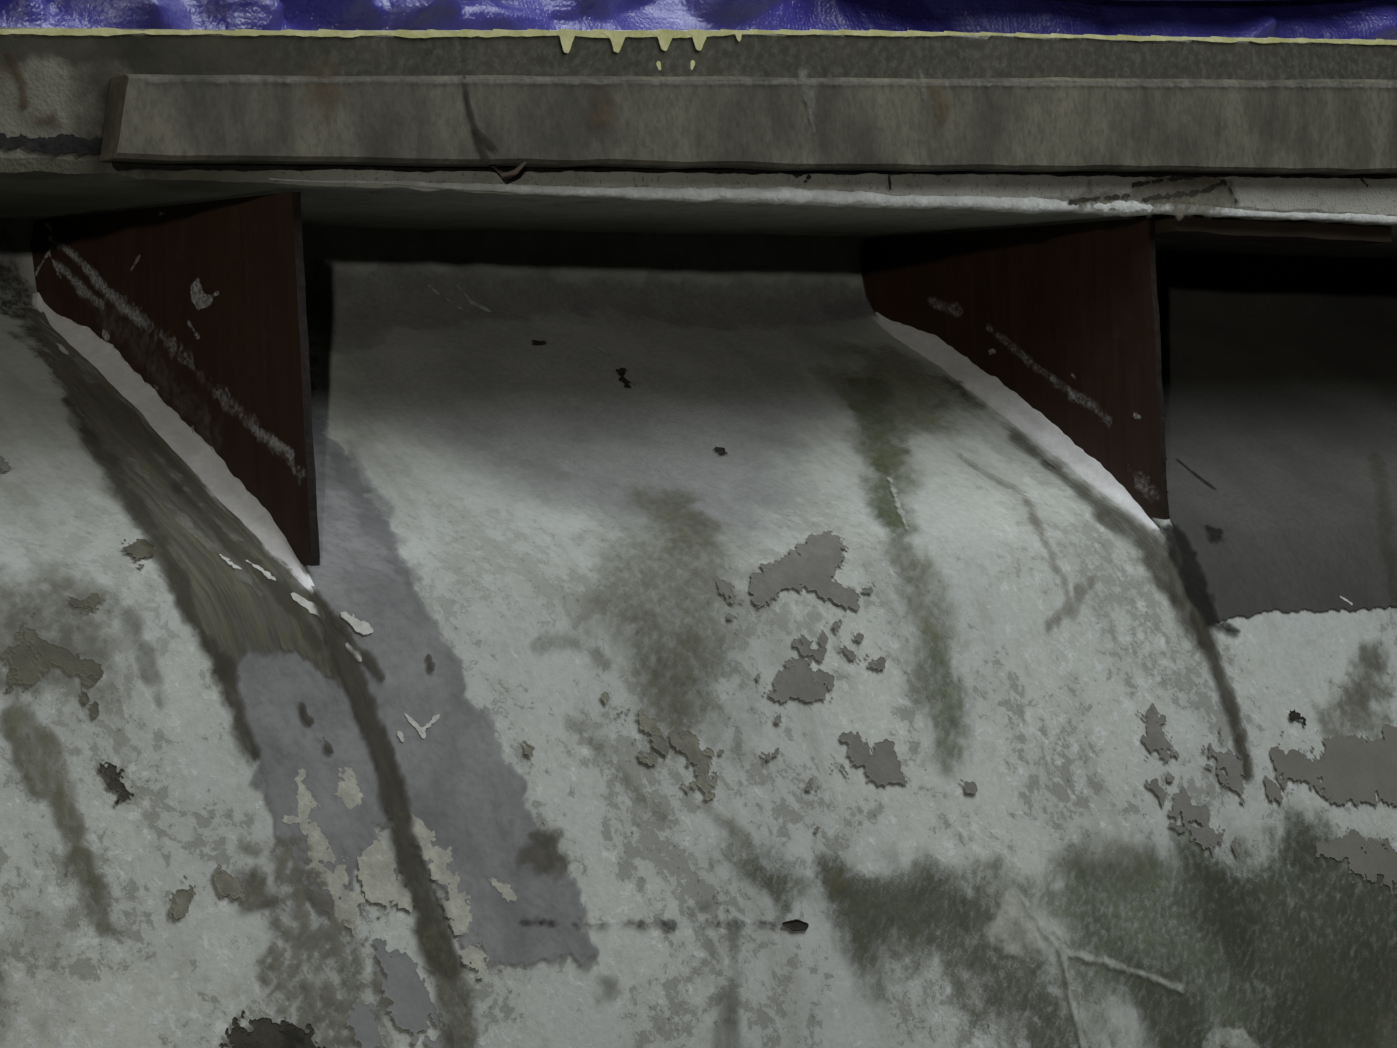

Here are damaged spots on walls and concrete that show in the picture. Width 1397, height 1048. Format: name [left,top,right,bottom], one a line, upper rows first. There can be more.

crack [0,133,138,164]
leakage [0,577,111,932]
leakage [66,403,478,1048]
peeling [78,259,599,1048]
crack [525,919,677,930]
crack [717,919,809,931]
peeling [715,530,886,724]
peeling [830,731,908,786]
leakage [899,548,963,767]
peeling [1137,703,1240,861]
peeling [1202,709,1397,807]
peeling [1316,826,1397,894]